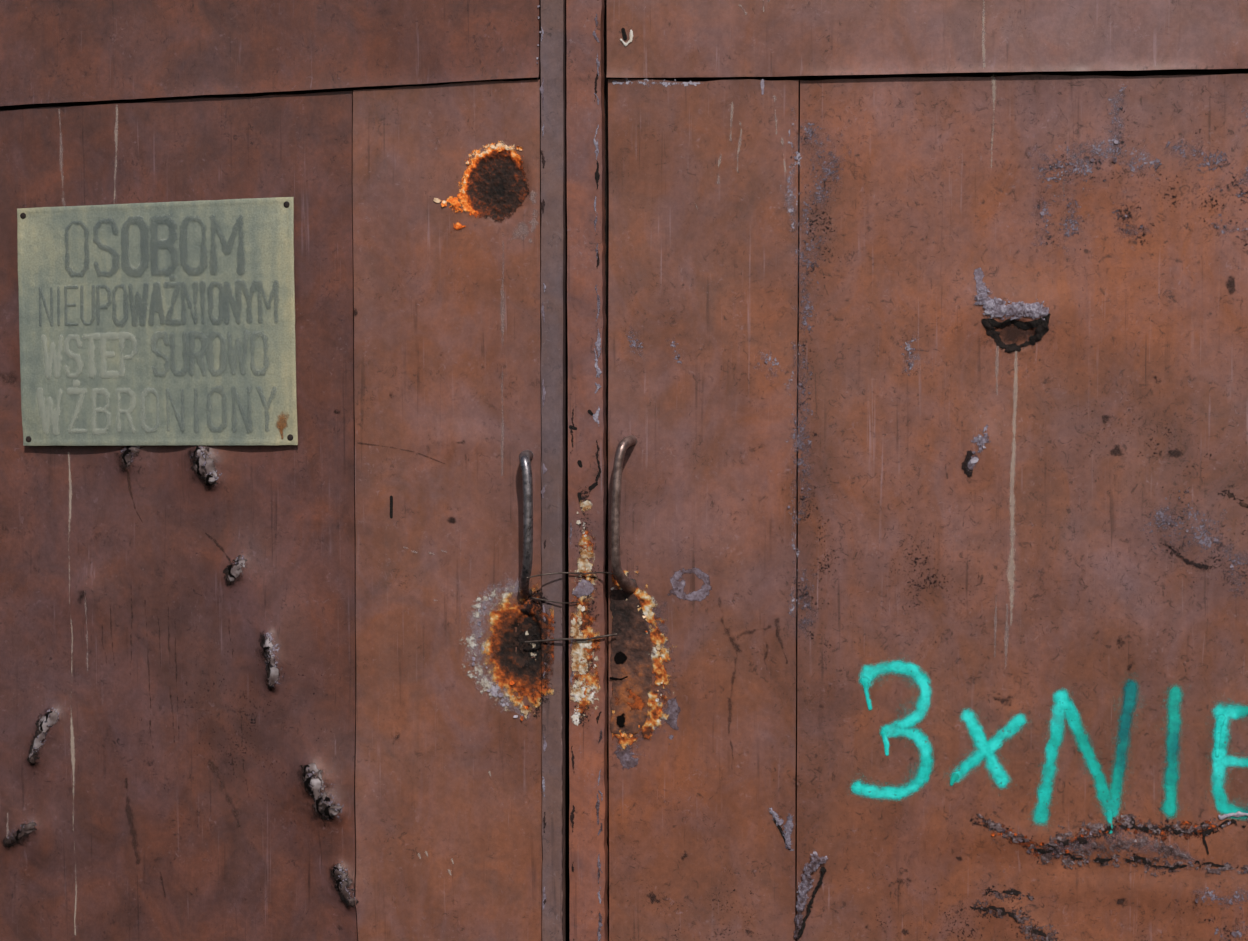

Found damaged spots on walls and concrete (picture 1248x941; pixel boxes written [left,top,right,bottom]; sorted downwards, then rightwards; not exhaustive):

rust [462,579,556,721]
rust [570,486,600,726]